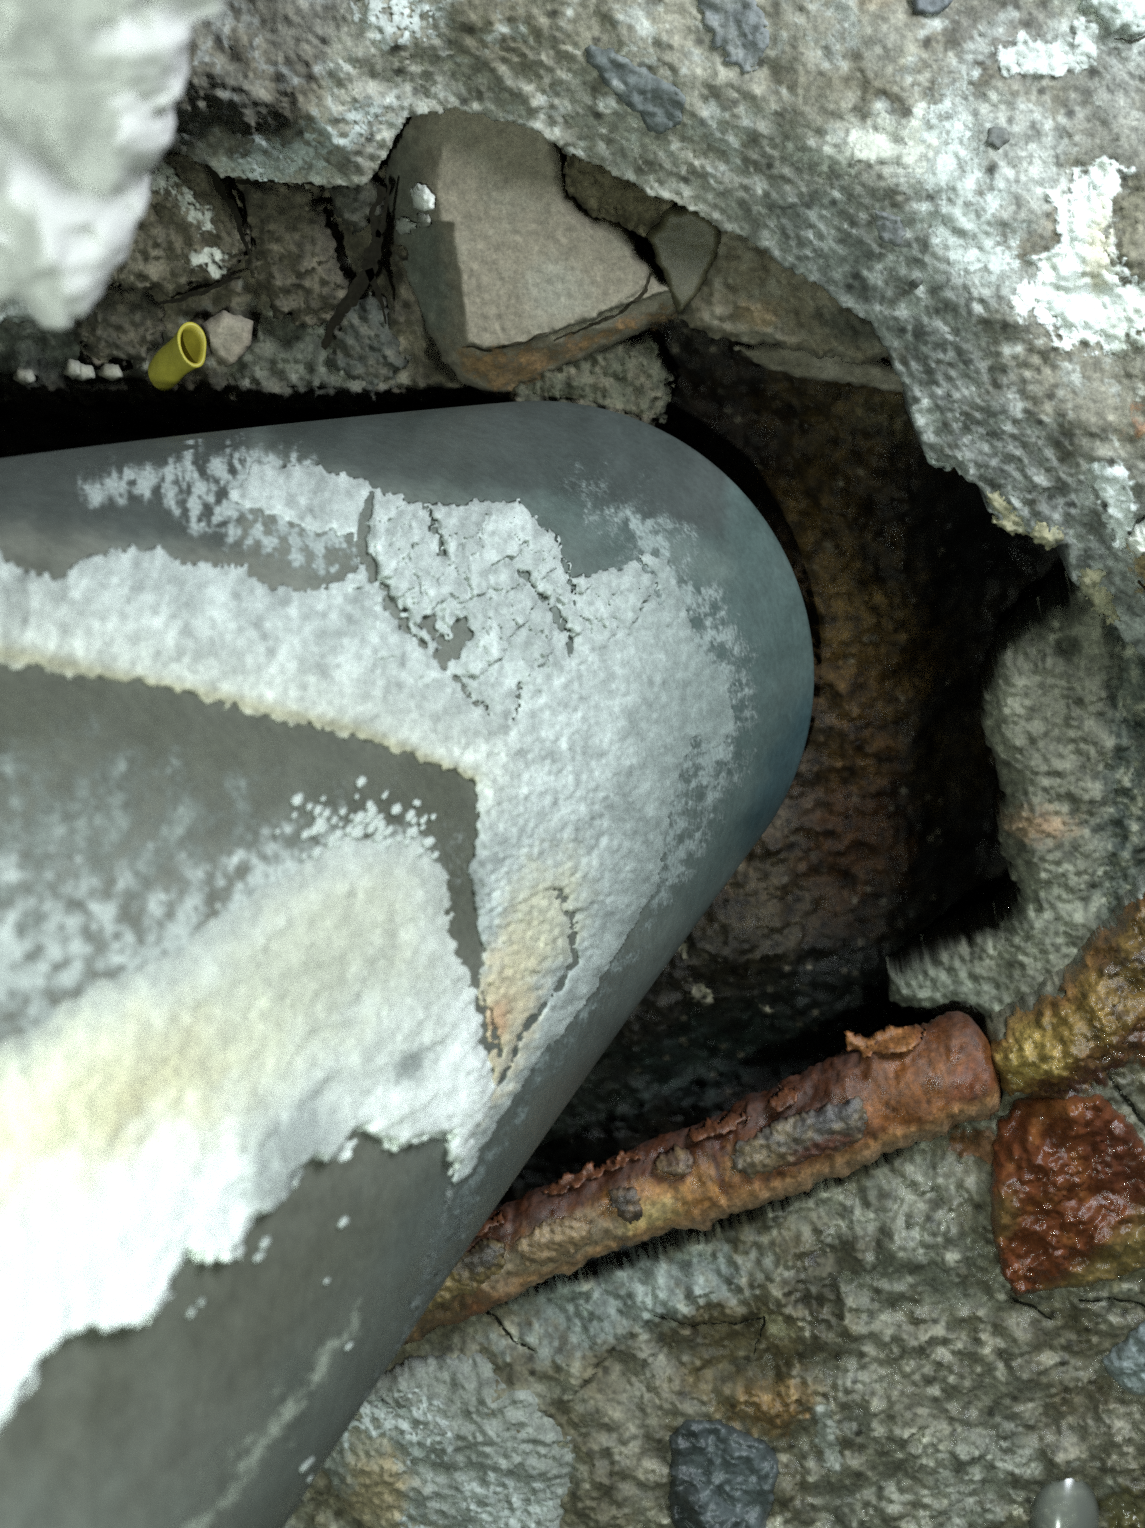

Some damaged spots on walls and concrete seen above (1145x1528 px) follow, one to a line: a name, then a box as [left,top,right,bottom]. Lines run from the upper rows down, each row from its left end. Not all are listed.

damp [991,17,1099,78]
crack [1114,35,1145,43]
peeling [395,212,431,235]
damp [784,69,1145,356]
spalling [645,205,721,313]
damp [922,446,955,472]
corrosion [844,1024,927,1058]
corrosion [948,892,1145,1296]
corrosion [687,1111,752,1143]
corrosion [542,1147,646,1195]
corrosion [515,1216,592,1267]
spalling [793,1230,879,1299]